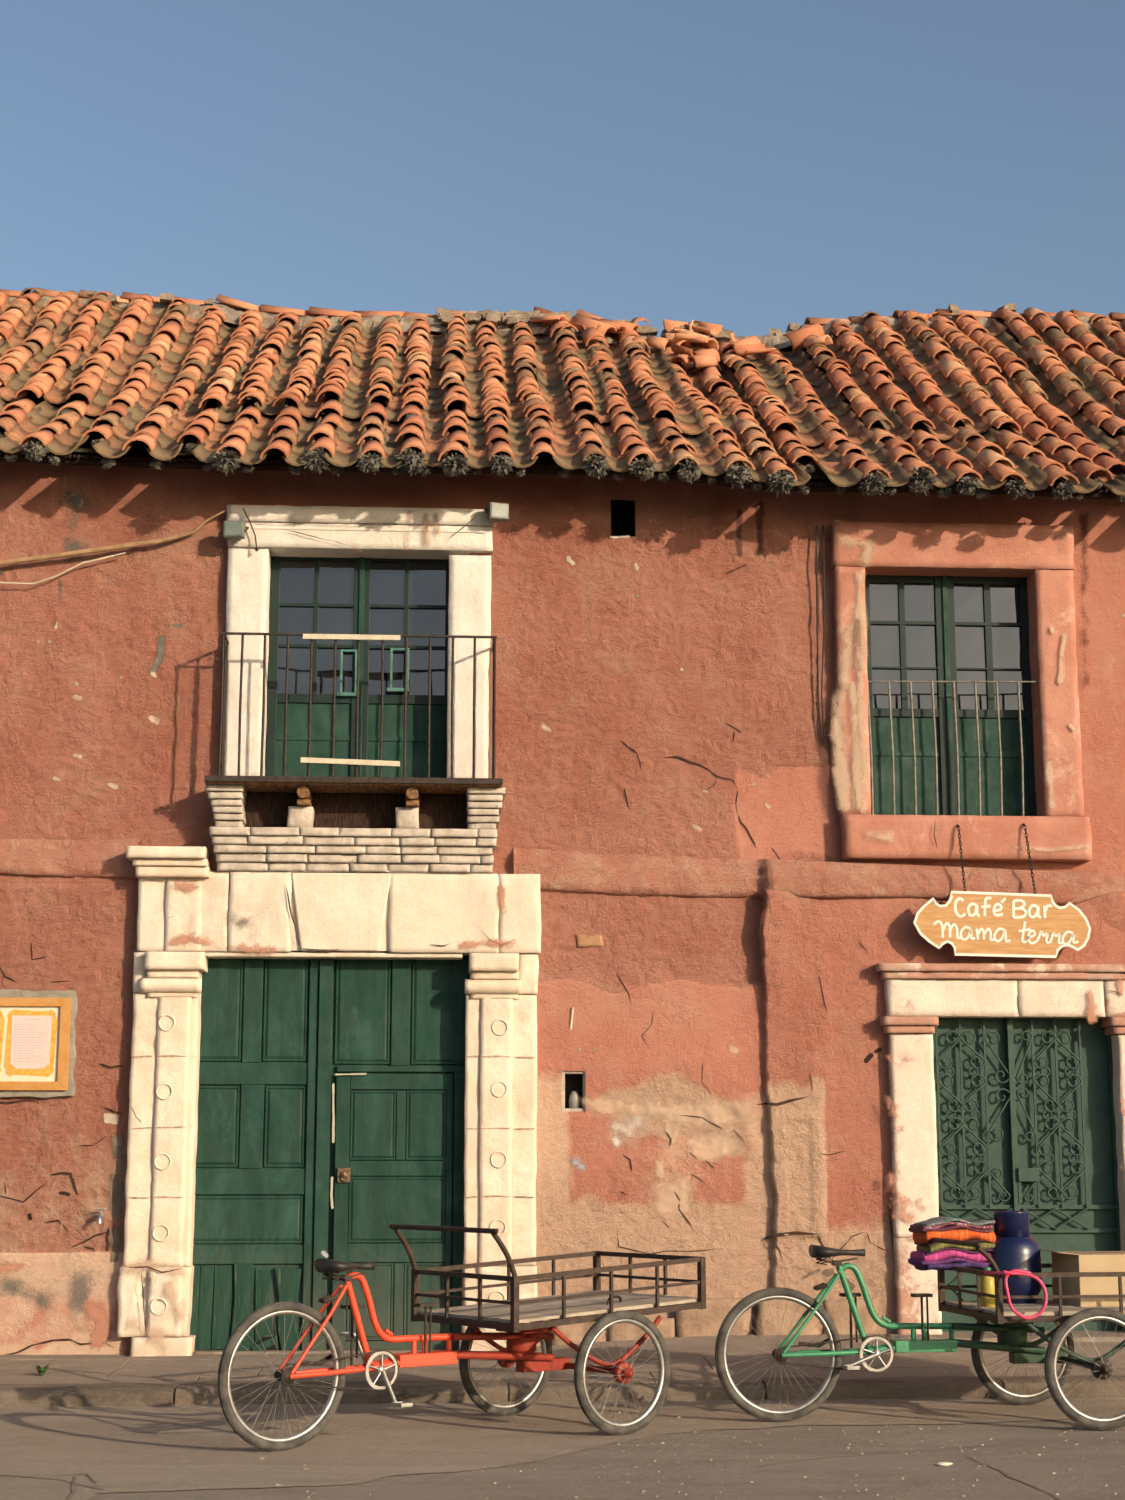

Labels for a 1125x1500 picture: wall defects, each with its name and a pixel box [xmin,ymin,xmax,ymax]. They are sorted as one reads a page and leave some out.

crack [621,741,780,859]
crack [99,1062,123,1070]
crack [0,1098,38,1106]
spalling [586,1096,751,1160]
spalling [655,1161,691,1216]
crack [0,1107,184,1334]
damp [0,1258,112,1347]
crack [4,1338,112,1355]
crack [0,1473,104,1500]